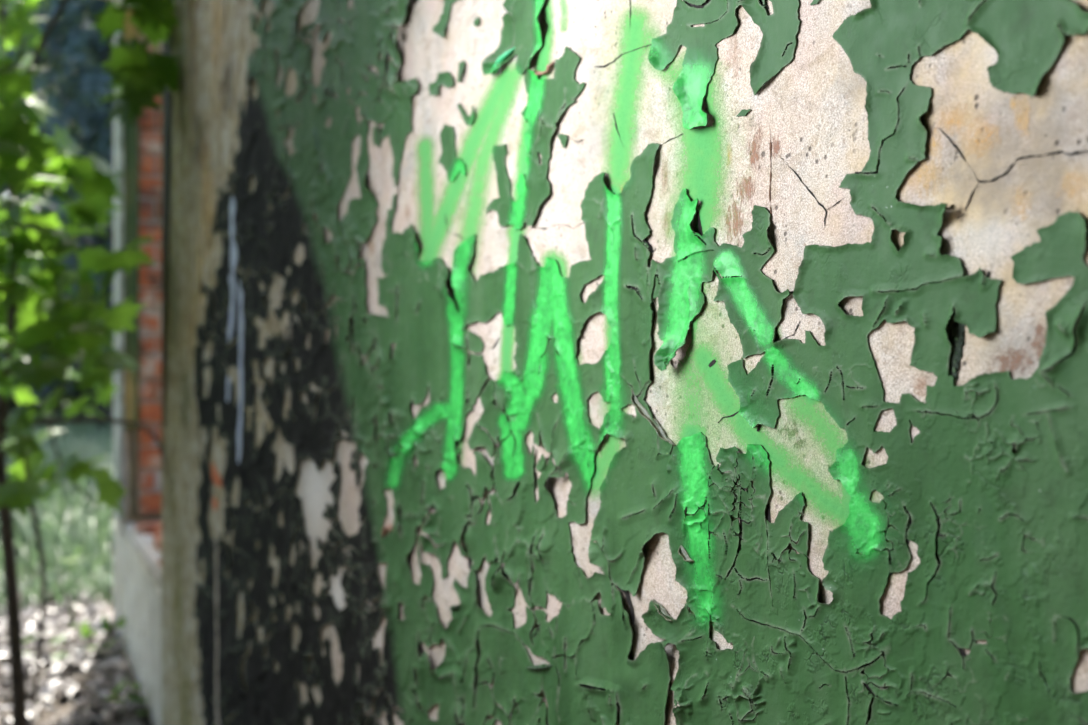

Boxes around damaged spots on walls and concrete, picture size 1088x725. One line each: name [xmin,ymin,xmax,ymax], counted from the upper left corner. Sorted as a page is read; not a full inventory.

peeling [323,0,874,346]
crack [681,210,714,261]
crack [769,126,842,229]
crack [855,47,923,174]
peeling [868,30,1088,432]
crack [926,123,1088,219]
peeling [236,225,368,686]
peeling [410,508,494,666]
peeling [551,391,609,578]
peeling [616,532,694,725]
peeling [623,270,765,469]
peeling [768,464,840,604]